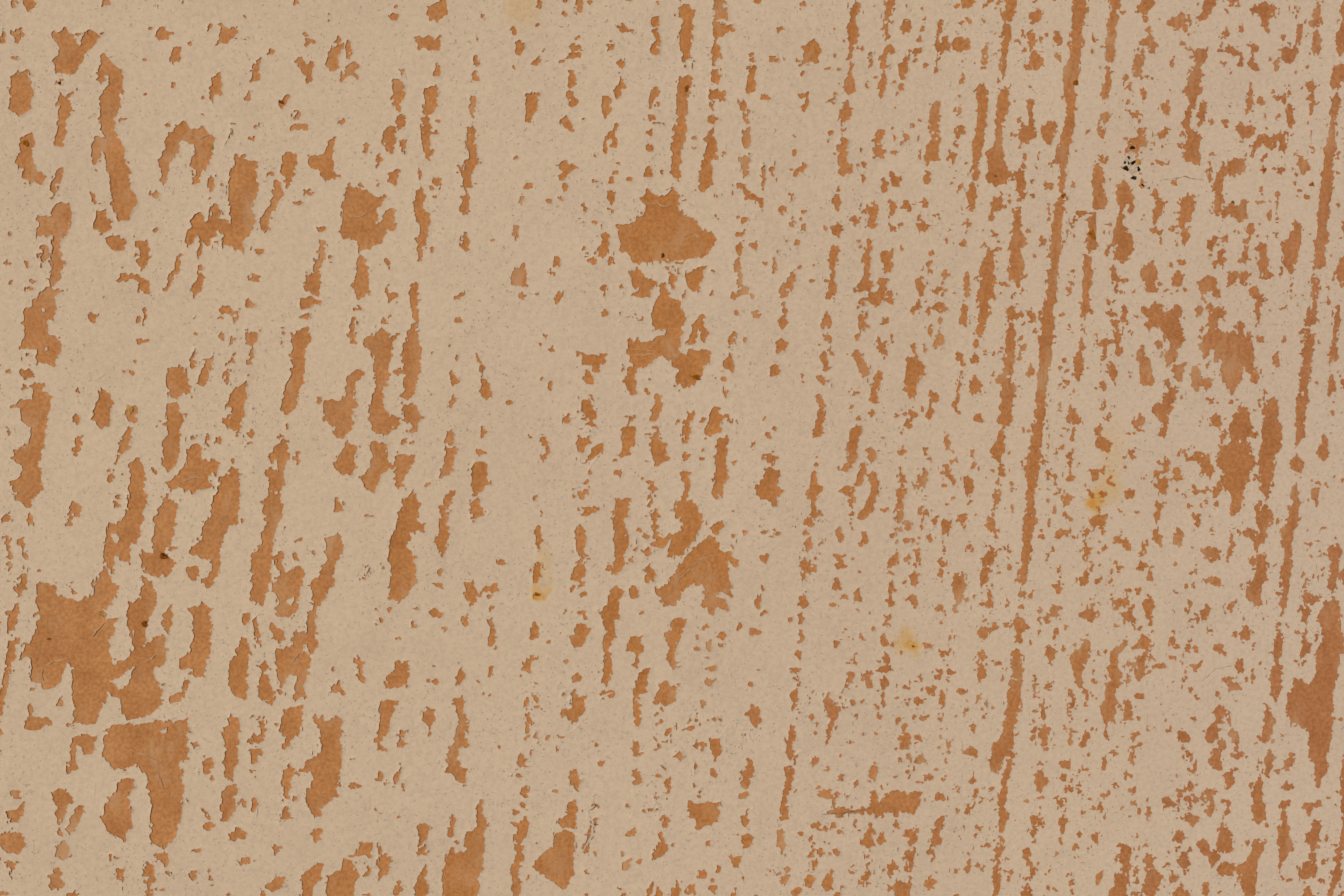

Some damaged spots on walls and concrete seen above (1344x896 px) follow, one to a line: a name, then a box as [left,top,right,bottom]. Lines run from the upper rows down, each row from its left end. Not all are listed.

peeling [0,0,517,896]
peeling [486,0,1344,896]